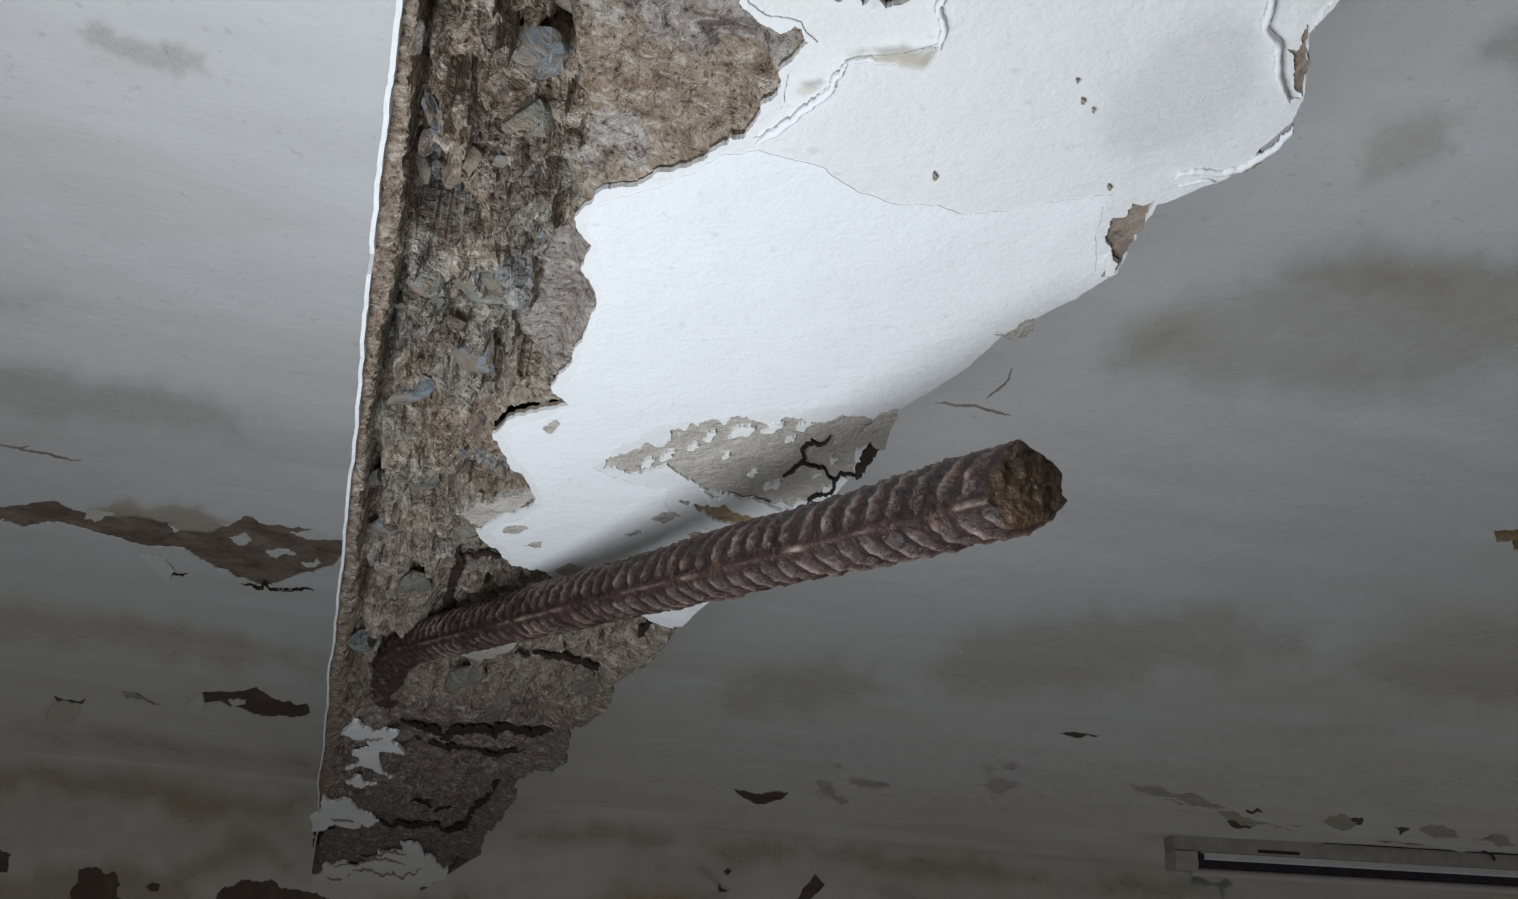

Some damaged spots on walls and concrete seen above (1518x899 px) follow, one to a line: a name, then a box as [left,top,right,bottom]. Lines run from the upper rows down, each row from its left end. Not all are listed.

flaking render [1260,0,1310,104]
flaking render [1174,123,1294,188]
flaking render [1103,203,1152,277]
spalling [0,0,1067,899]
crack [782,435,879,505]
flaking render [1494,529,1518,549]
crack [375,719,574,834]
leakage [643,734,1179,797]
crack [313,826,335,847]
leakage [0,872,78,899]
leakage [102,866,186,899]